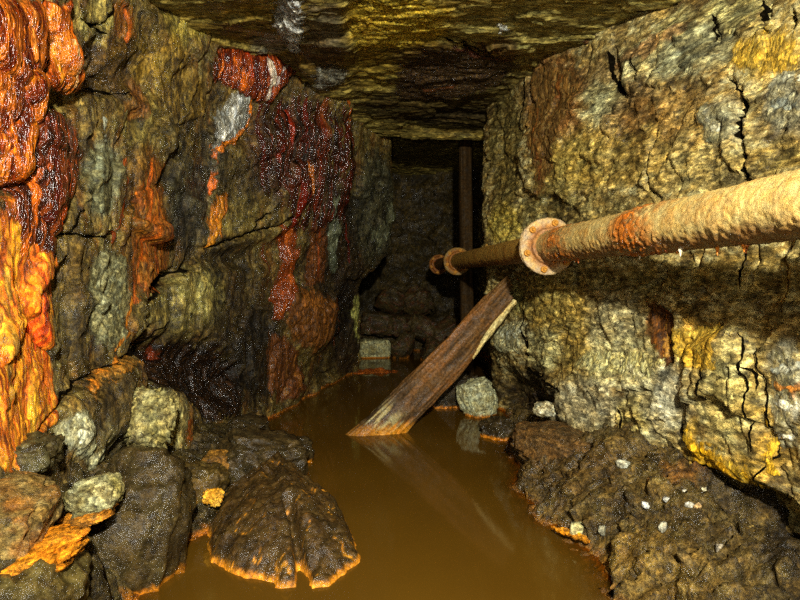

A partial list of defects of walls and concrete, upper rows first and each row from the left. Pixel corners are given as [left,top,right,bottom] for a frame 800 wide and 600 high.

crack [712,14,721,41]
crack [760,0,772,31]
crack [607,51,637,96]
crack [729,79,750,180]
rust [205,172,228,248]
rust [255,91,356,320]
rust [0,107,83,472]
crack [695,365,707,400]
crack [736,332,781,488]